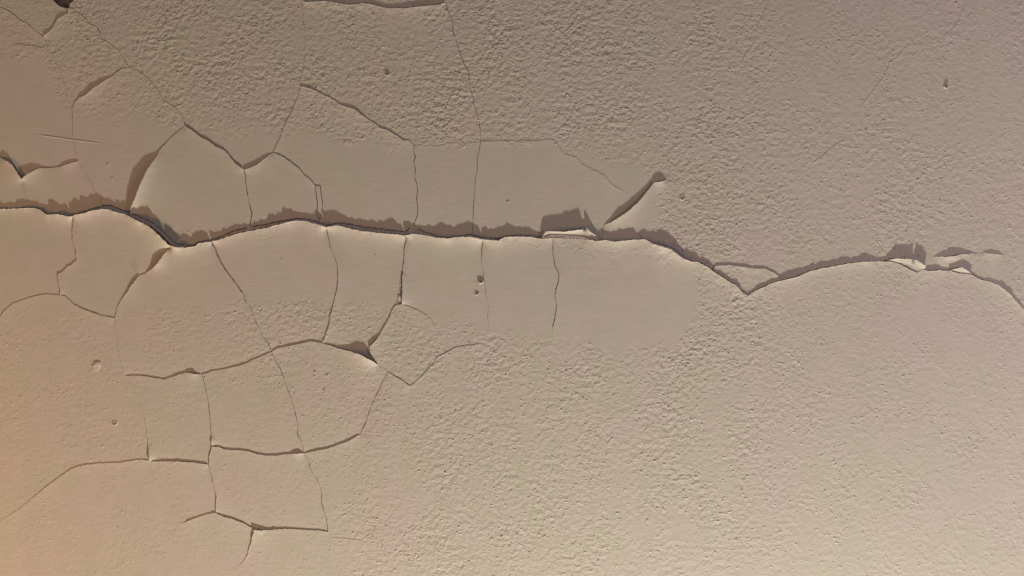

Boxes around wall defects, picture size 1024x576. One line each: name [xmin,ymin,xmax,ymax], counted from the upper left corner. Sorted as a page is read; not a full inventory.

peeling [0,0,699,532]
crack [0,4,733,531]
peeling [713,265,782,295]
crack [740,261,998,296]
peeling [884,253,1013,293]